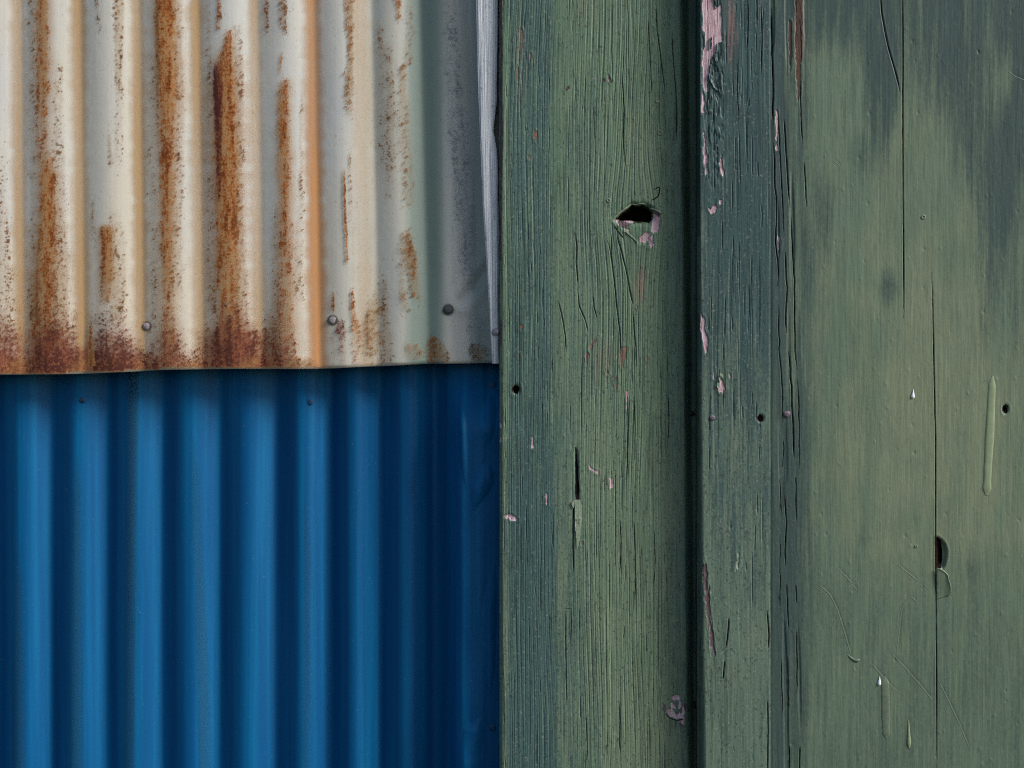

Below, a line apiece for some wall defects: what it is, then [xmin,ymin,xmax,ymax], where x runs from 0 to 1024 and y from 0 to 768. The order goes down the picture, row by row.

peeling [701,0,723,113]
peeling [788,0,802,99]
corrosion [0,0,450,374]
peeling [613,203,662,248]
peeling [703,132,724,176]
crack [880,0,904,299]
peeling [700,314,708,353]
crack [930,290,938,602]
crack [572,447,582,572]
peeling [702,564,716,656]
peeling [662,695,694,728]
crack [932,643,940,738]